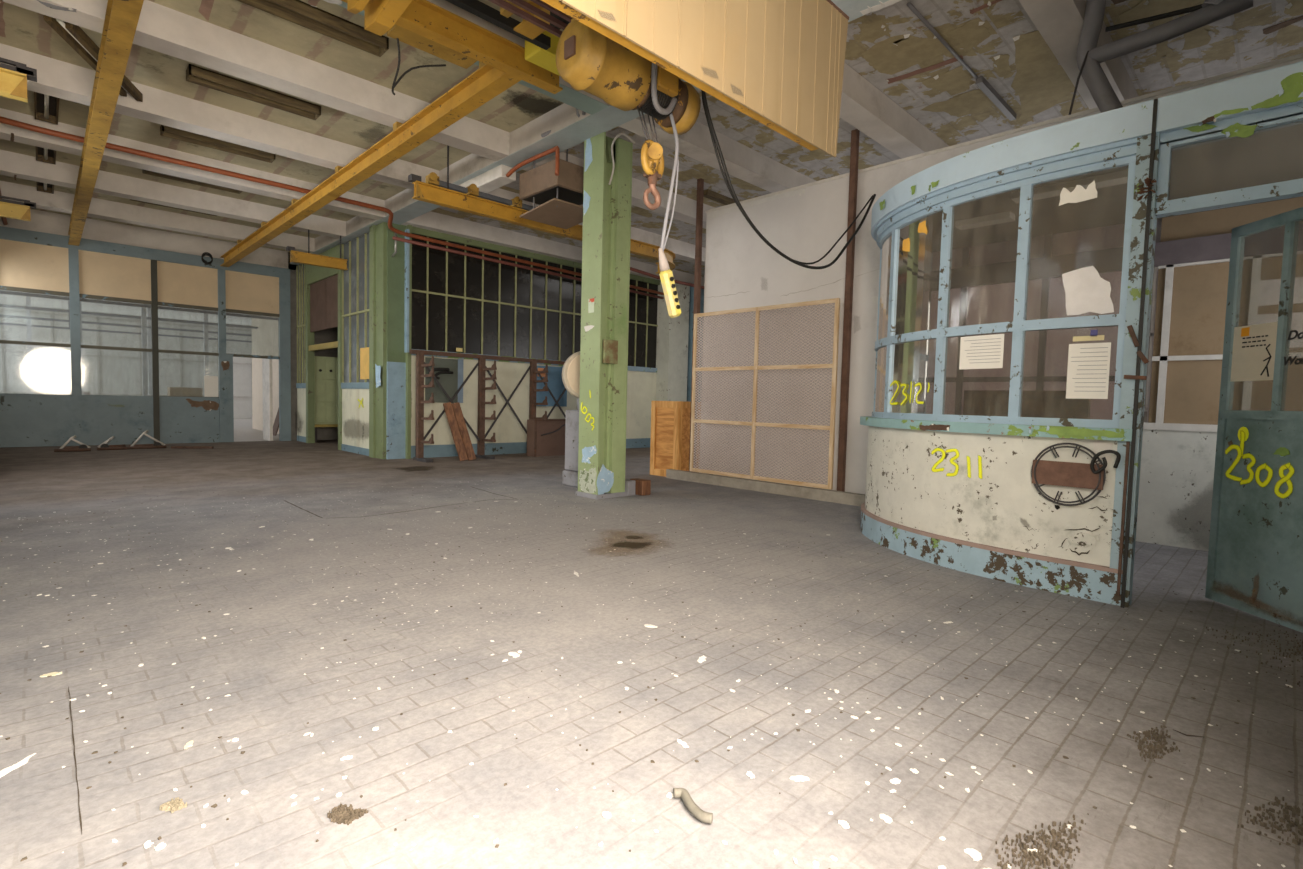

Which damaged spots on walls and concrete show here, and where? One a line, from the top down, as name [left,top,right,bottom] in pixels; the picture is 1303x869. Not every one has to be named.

peeling [858,0,963,84]
peeling [1111,0,1202,23]
peeling [1263,0,1303,34]
peeling [921,89,995,117]
peeling [992,30,1075,122]
peeling [1183,72,1303,138]